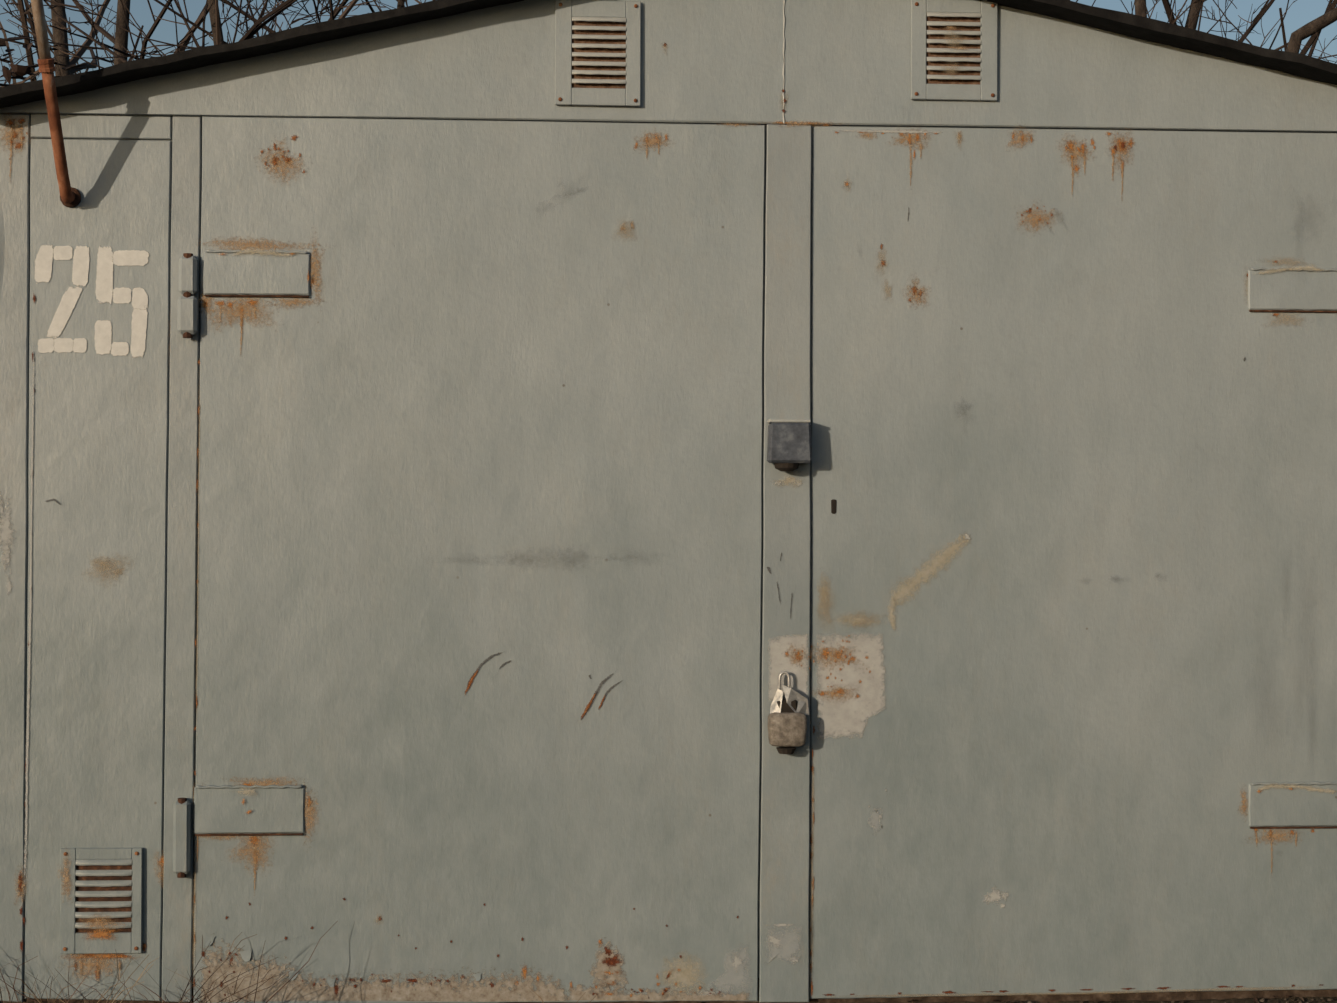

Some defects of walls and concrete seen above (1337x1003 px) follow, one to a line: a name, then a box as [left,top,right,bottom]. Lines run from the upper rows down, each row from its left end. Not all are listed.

corrosion [0,118,27,176]
corrosion [261,135,305,179]
corrosion [897,133,927,186]
corrosion [1065,132,1133,193]
corrosion [216,239,321,306]
corrosion [198,293,264,350]
corrosion [66,918,146,979]
peeling [200,935,749,1003]